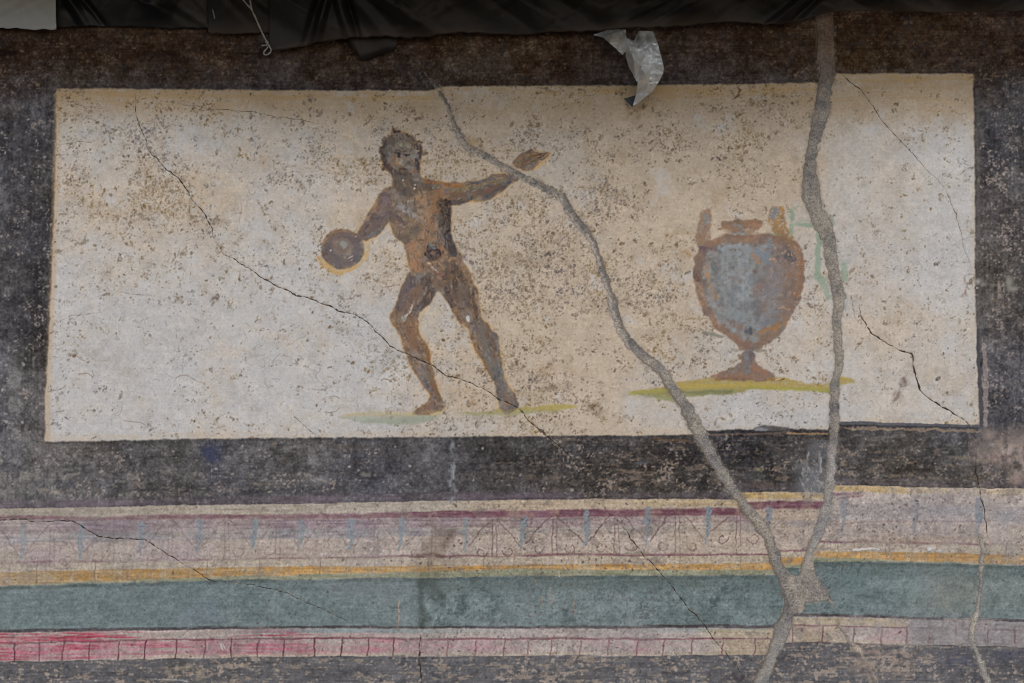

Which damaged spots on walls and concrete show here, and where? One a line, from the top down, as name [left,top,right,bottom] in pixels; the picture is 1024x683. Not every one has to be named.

crack [0,518,215,582]
crack [422,12,991,683]